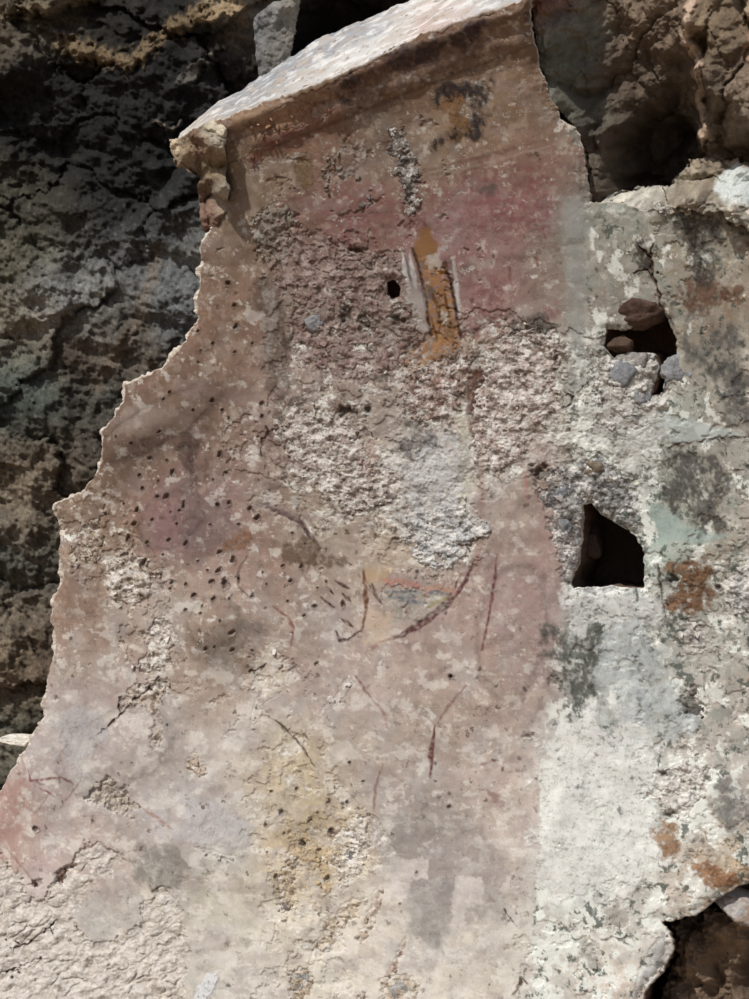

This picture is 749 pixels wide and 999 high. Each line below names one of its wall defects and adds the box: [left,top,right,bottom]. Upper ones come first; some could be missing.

spalling [248,203,650,595]
spalling [583,297,693,431]
crack [100,676,163,733]
spalling [0,842,190,999]